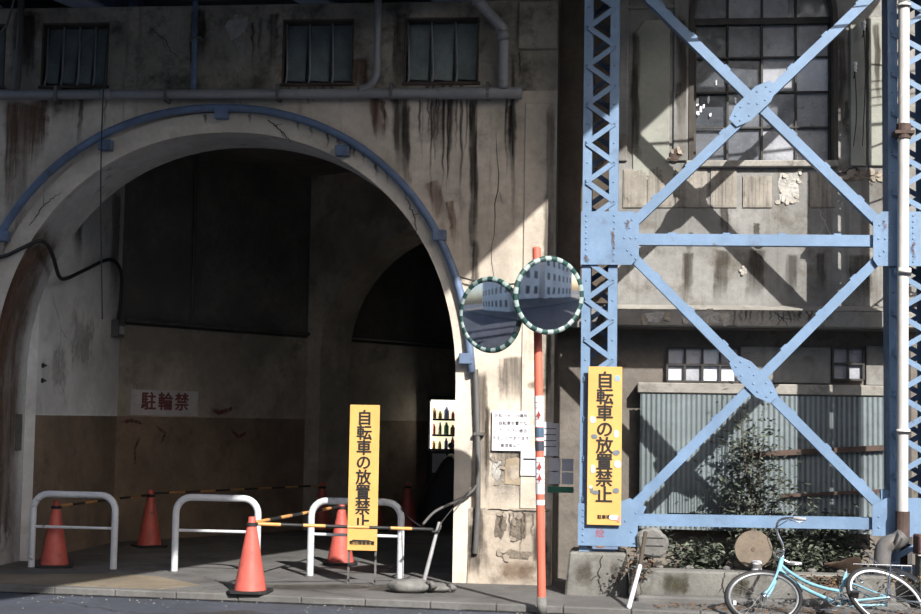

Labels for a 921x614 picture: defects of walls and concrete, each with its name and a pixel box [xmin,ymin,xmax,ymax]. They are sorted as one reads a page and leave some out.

corrosion [6,101,47,175]
leakage [393,99,478,210]
peeling [775,169,802,205]
leakage [721,208,729,229]
leakage [684,254,692,285]
leakage [749,250,763,284]
leakage [849,256,869,285]